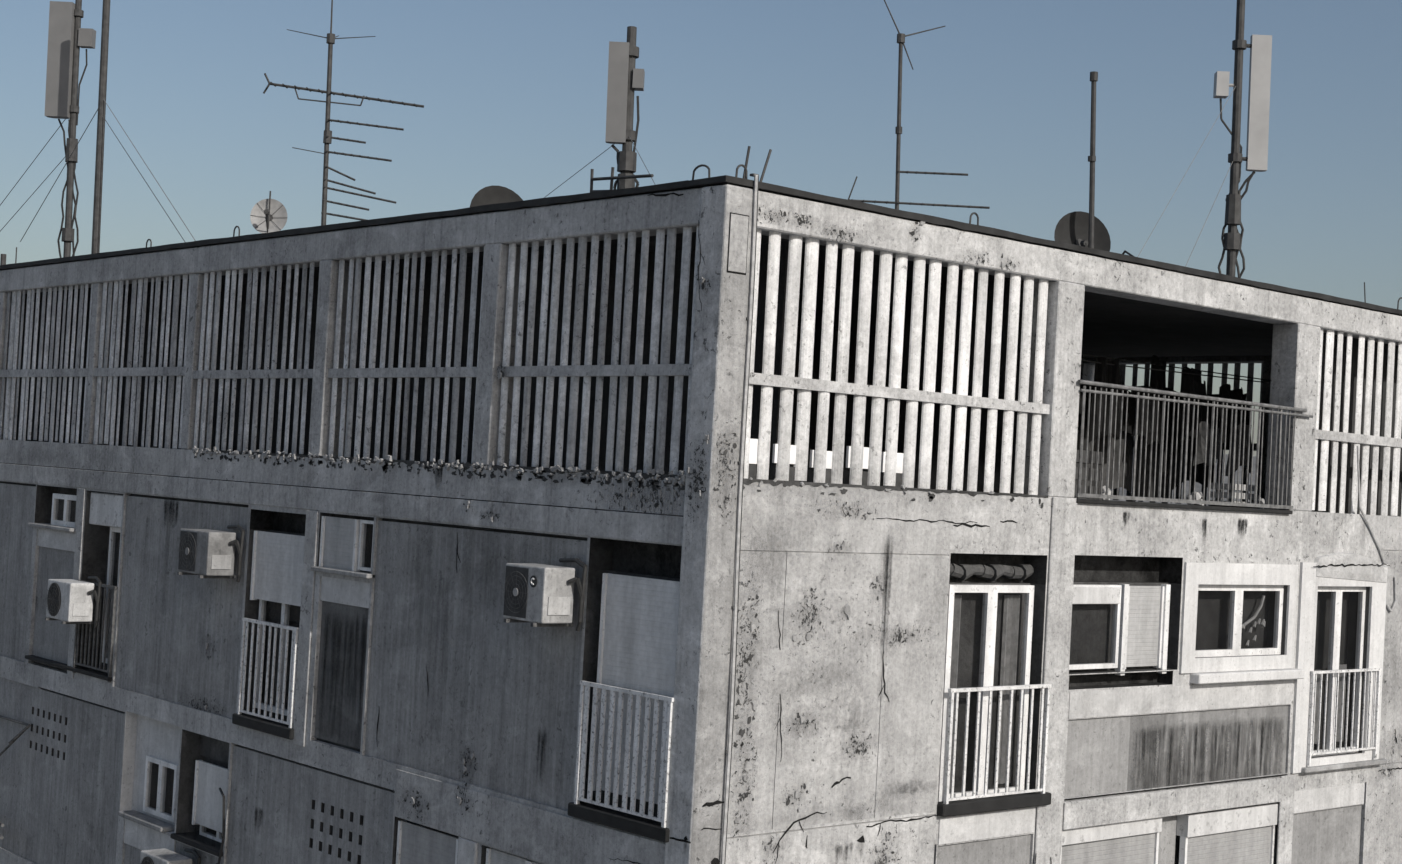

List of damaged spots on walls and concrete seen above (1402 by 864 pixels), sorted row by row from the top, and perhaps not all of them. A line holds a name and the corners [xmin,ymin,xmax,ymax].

crack [877,518,1017,528]
crack [878,653,889,701]
leakage [1136,722,1276,789]
crack [773,777,851,863]
crack [866,815,938,835]